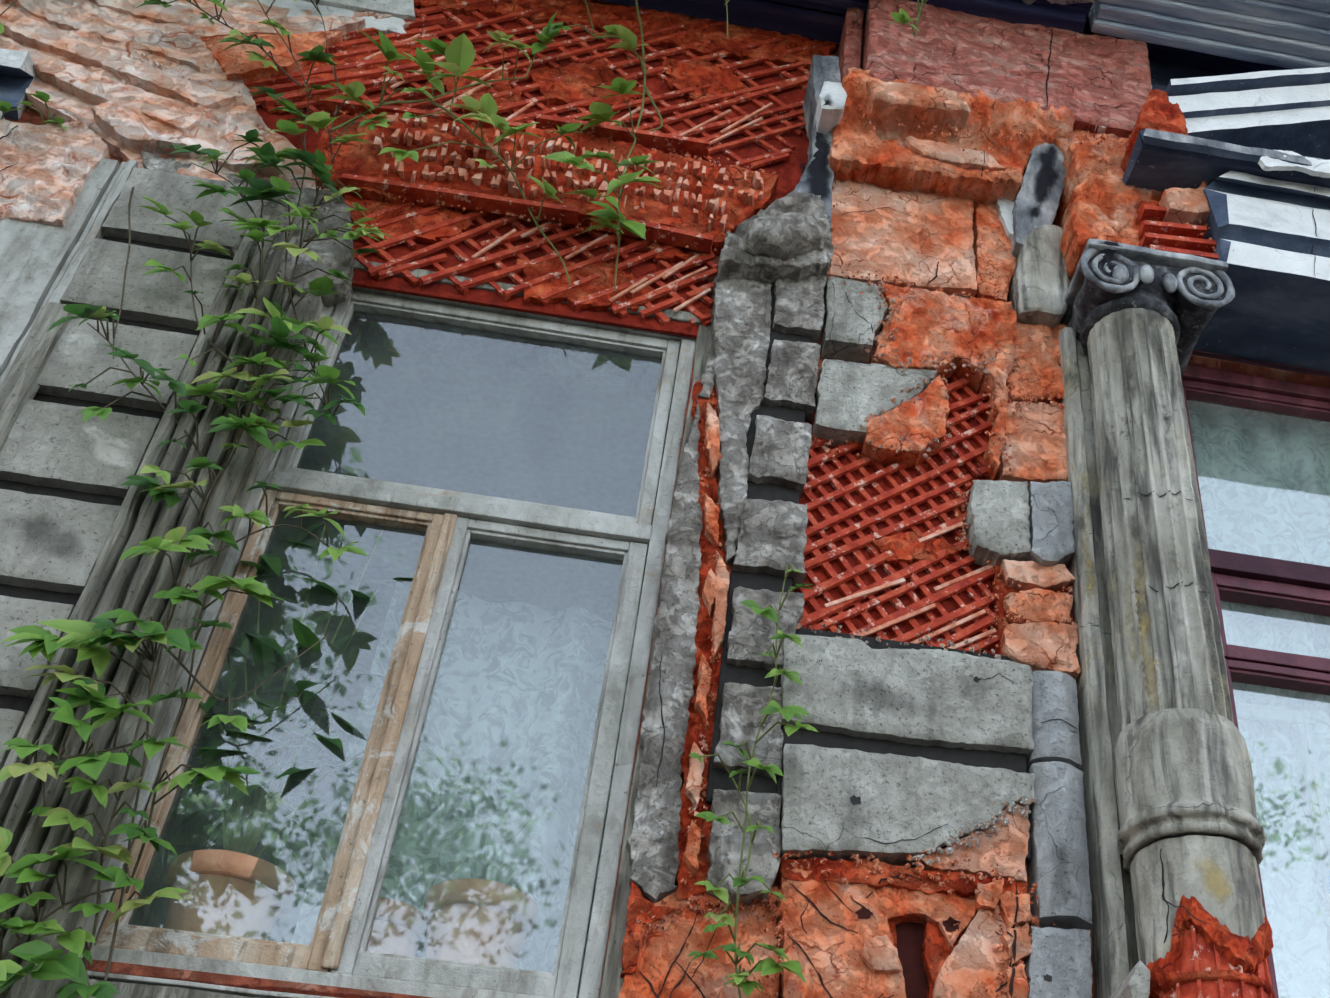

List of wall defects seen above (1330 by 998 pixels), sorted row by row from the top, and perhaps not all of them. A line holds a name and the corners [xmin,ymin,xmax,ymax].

spalling [0,0,836,338]
crack [1045,29,1053,107]
spalling [792,67,1219,680]
spalling [618,793,1055,998]
crack [787,824,947,998]
spalling [1110,895,1275,998]